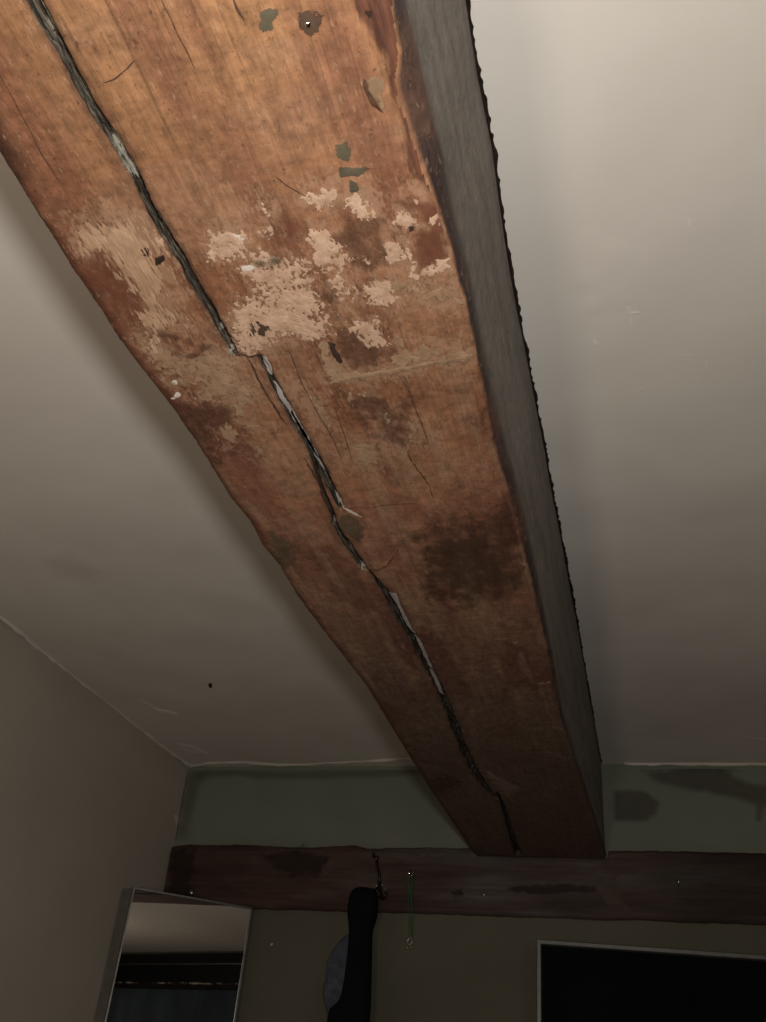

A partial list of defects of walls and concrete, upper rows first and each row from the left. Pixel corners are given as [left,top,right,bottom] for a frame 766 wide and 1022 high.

peeling [69,199,474,448]
crack [27,0,521,855]
peeling [299,183,376,221]
leakage [655,769,766,802]